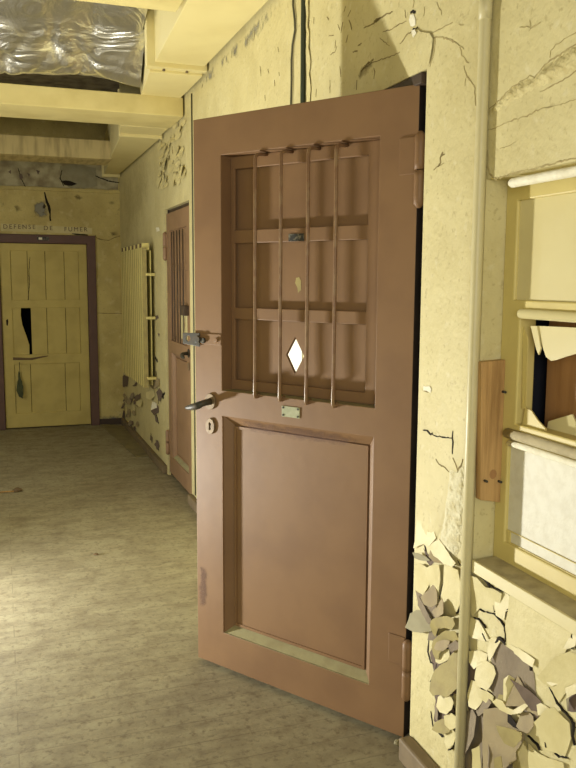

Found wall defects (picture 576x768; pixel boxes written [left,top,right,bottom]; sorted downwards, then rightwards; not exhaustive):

crack [313,0,576,130]
peeling [156,114,187,191]
crack [43,192,51,221]
peeling [121,373,165,430]
crack [423,429,463,473]
peeling [405,520,461,751]
peeling [464,575,576,768]